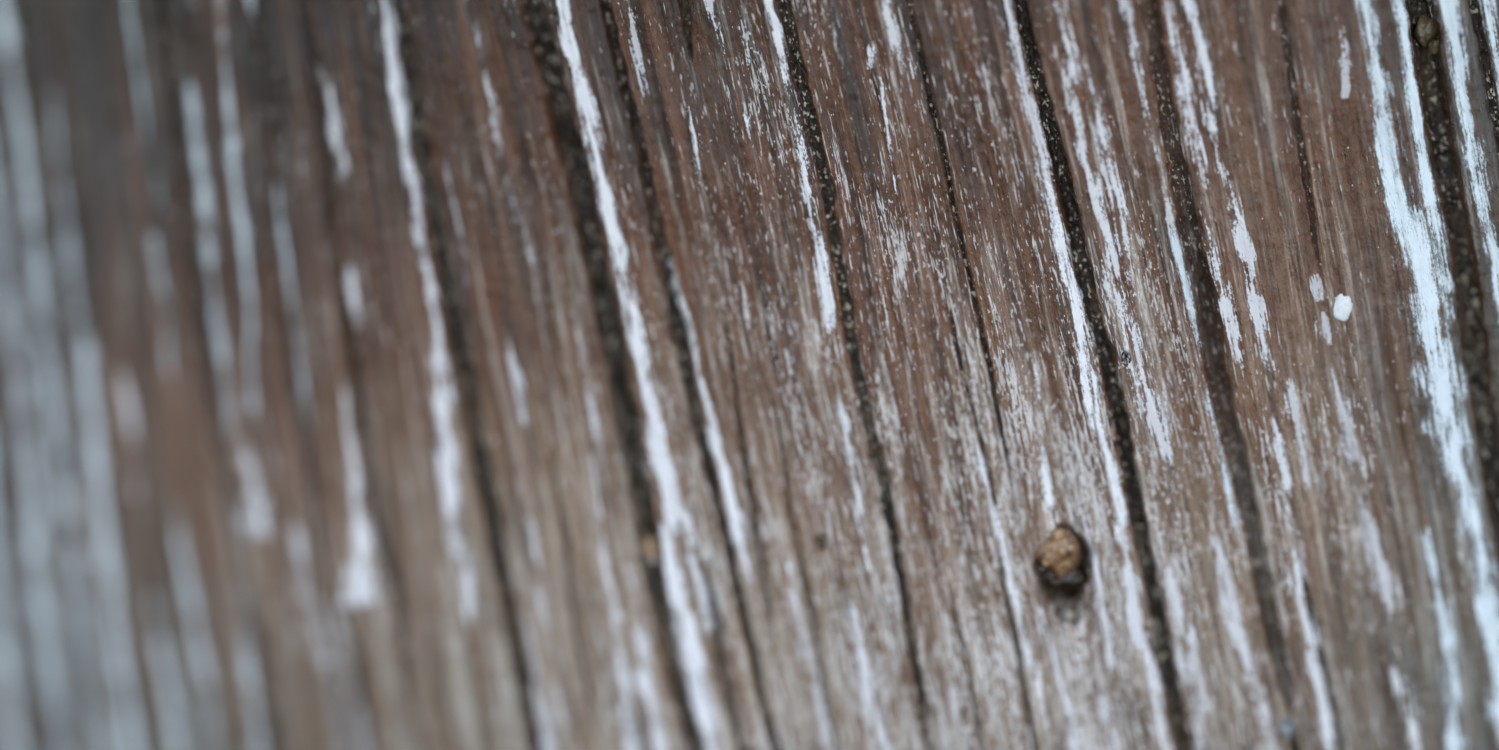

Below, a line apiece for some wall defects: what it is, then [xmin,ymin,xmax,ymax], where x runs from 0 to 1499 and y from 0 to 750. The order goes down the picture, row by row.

crack [387,0,542,750]
crack [523,0,705,750]
crack [602,0,839,750]
spalling [816,536,827,550]
crack [1015,0,1193,750]
crack [1405,0,1499,558]